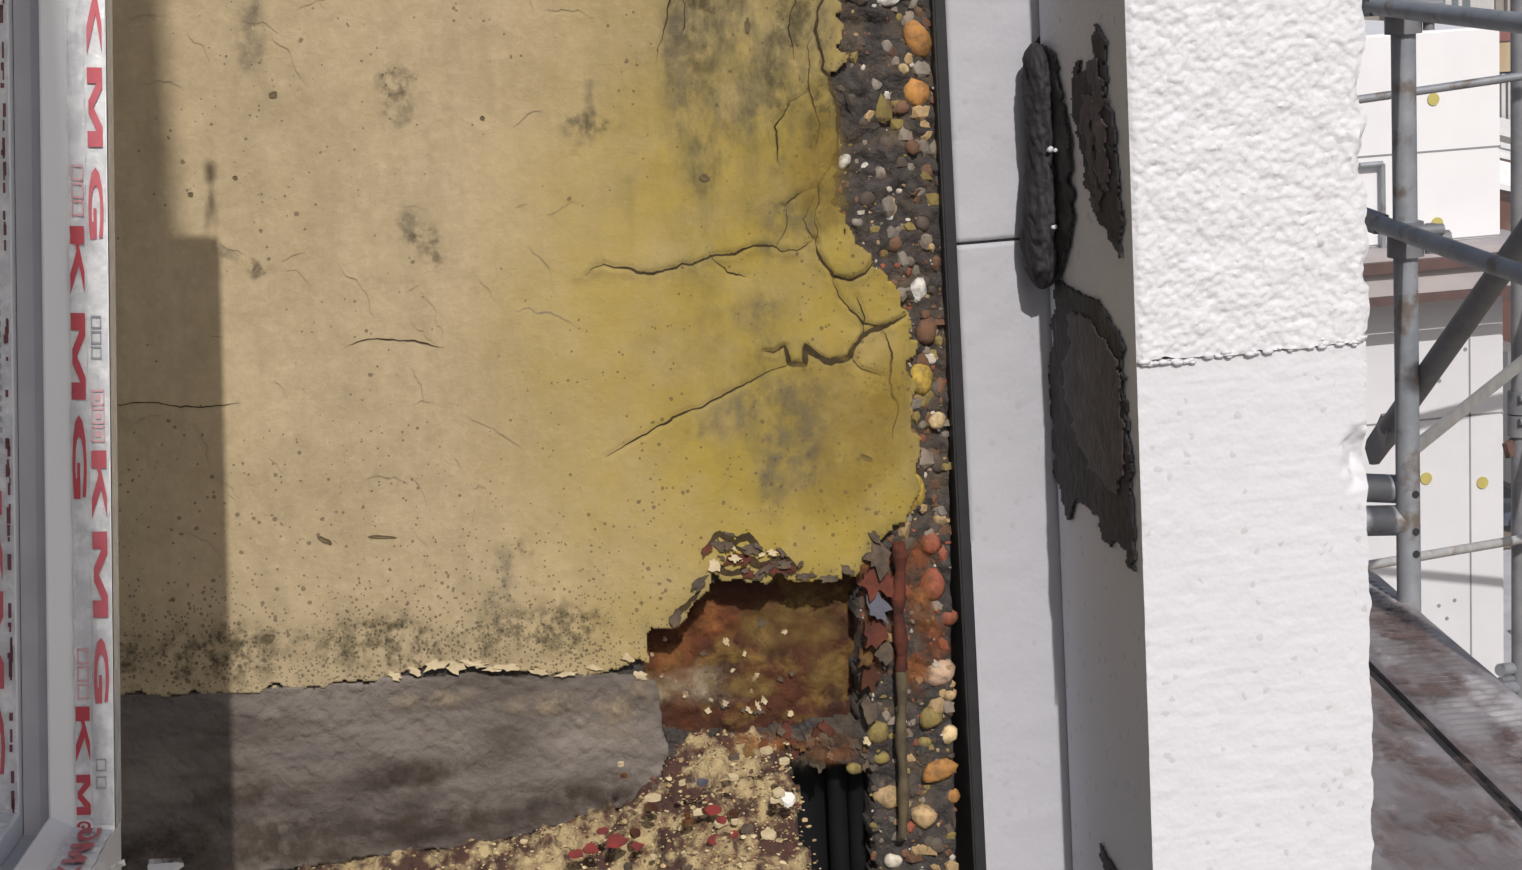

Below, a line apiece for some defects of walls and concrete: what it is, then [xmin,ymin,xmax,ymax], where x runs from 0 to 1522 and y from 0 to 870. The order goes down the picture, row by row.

crack [590,0,907,457]
spalling [622,0,961,870]
leakage [162,634,251,672]
leakage [330,620,422,659]
peeling [388,658,603,682]